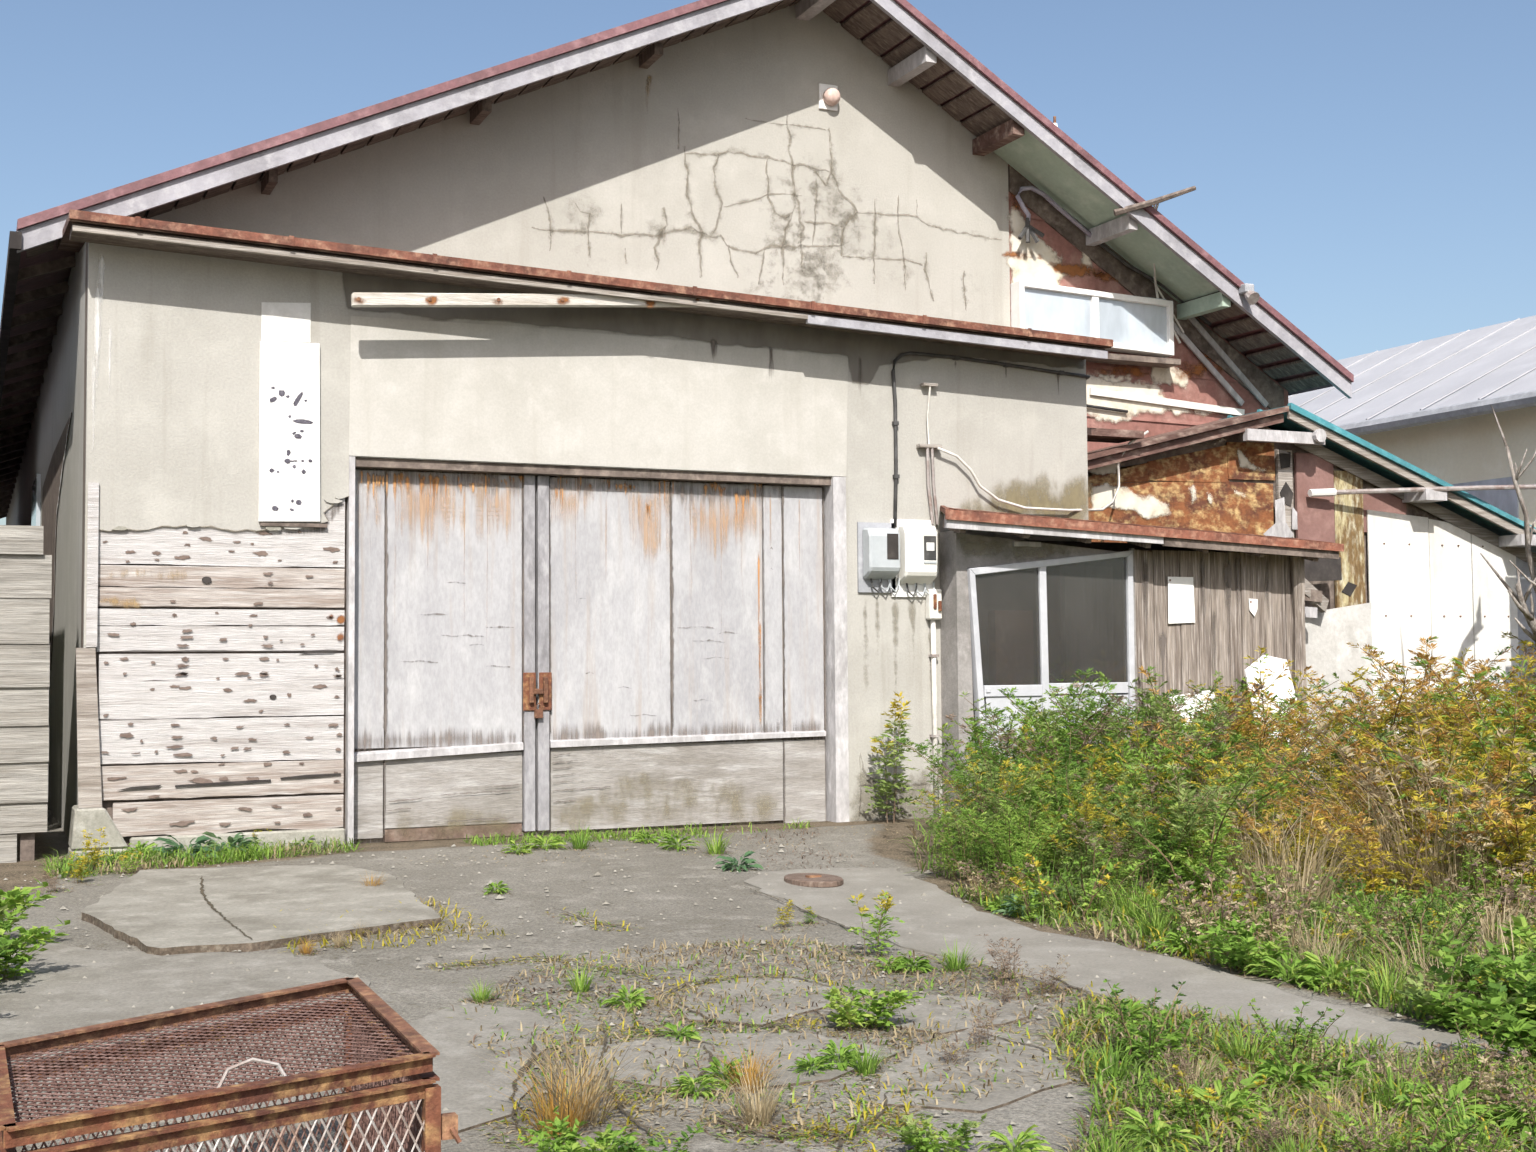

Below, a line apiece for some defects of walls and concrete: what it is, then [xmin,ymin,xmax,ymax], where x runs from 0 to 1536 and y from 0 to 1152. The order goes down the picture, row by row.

peeling [1007,206,1066,286]
leakage [343,273,1085,388]
peeling [1086,367,1211,423]
spalling [229,496,345,584]
corrosion [361,471,523,534]
corrosion [693,482,762,544]
leakage [969,481,1088,520]
corrosion [1088,442,1275,544]
peeling [150,600,193,690]
peeling [216,602,315,713]
peeling [101,722,304,783]
crack [200,877,252,939]